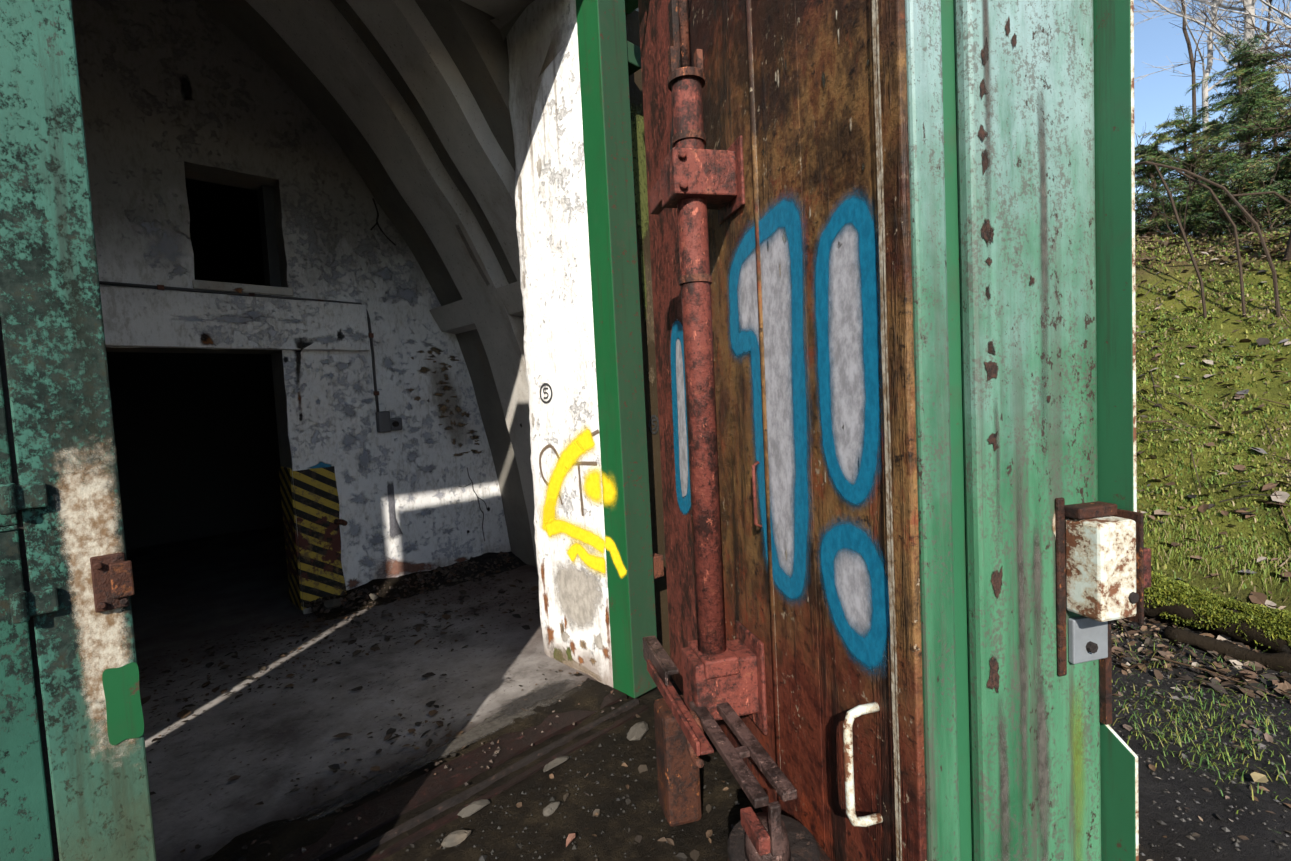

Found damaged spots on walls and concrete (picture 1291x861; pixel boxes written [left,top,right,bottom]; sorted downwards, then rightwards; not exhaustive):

rust [1005,17,1017,49]
rust [980,37,989,99]
rust [978,125,990,175]
rust [981,219,995,265]
rust [984,341,998,381]
peeling [384,340,482,456]
rust [987,431,999,451]
peeling [57,451,130,753]